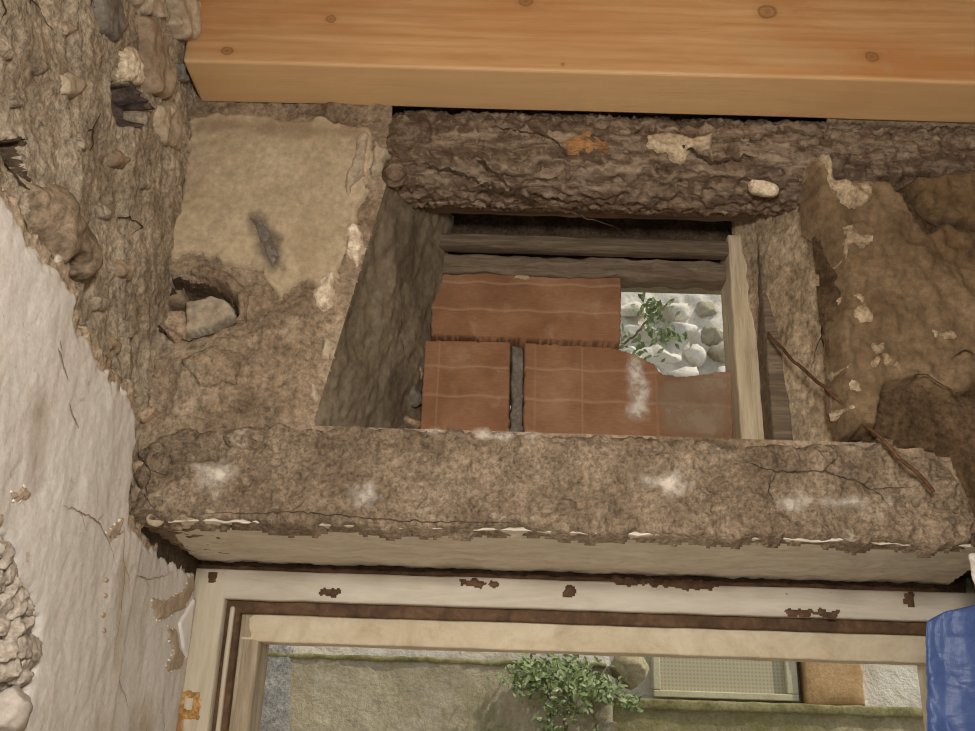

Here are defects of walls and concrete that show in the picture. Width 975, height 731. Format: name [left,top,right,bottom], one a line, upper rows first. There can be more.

peeling [0,181,158,441]
spalling [171,276,239,342]
water stain [630,359,648,416]
crack [735,455,902,504]
spalling [0,514,43,731]
peeling [150,572,195,673]
peeling [319,588,341,598]
peeling [459,578,499,589]
peeling [563,585,576,598]
peeling [610,575,720,591]
peeling [784,608,840,620]
rust [176,690,201,731]